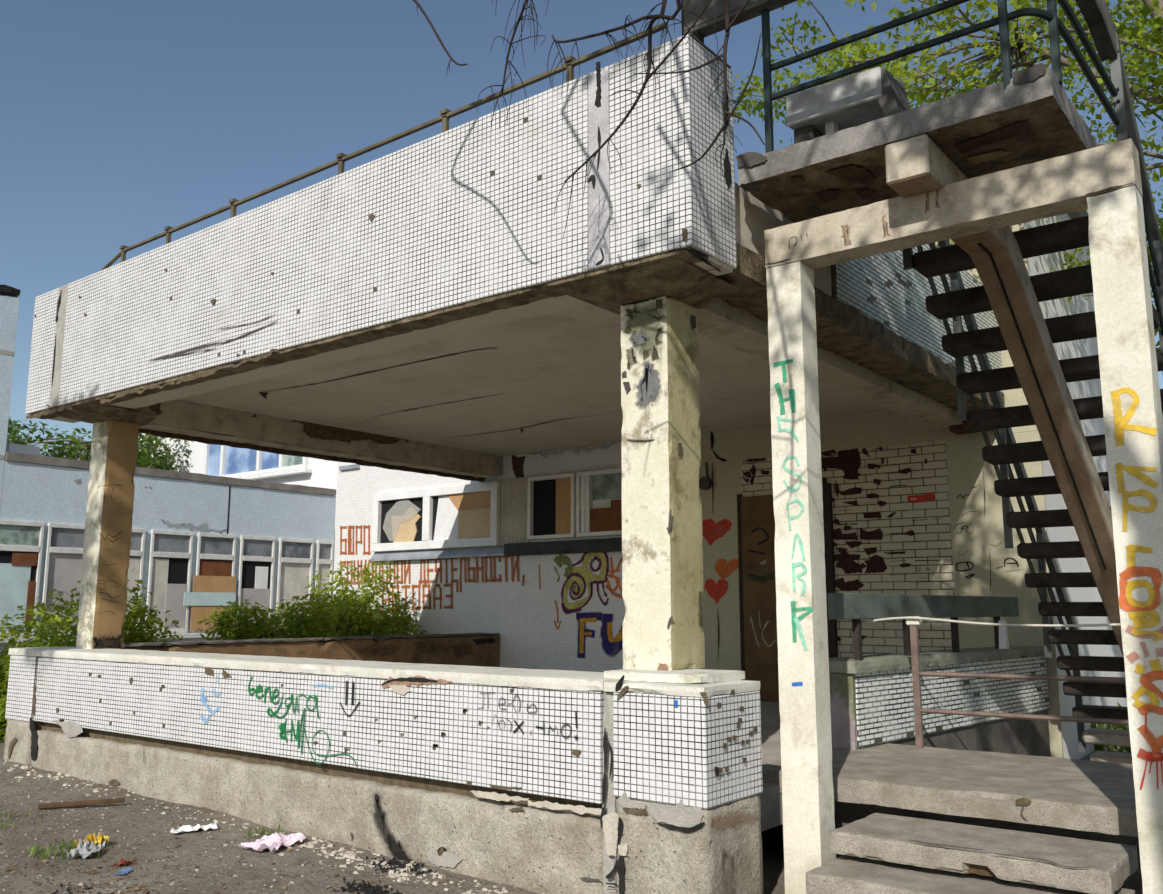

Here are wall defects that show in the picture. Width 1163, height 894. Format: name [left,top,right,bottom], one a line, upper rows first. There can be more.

peeling [629,333,649,346]
peeling [622,361,660,408]
peeling [280,420,408,444]
peeling [821,447,911,591]
spalling [381,675,451,695]
peeling [617,792,704,827]